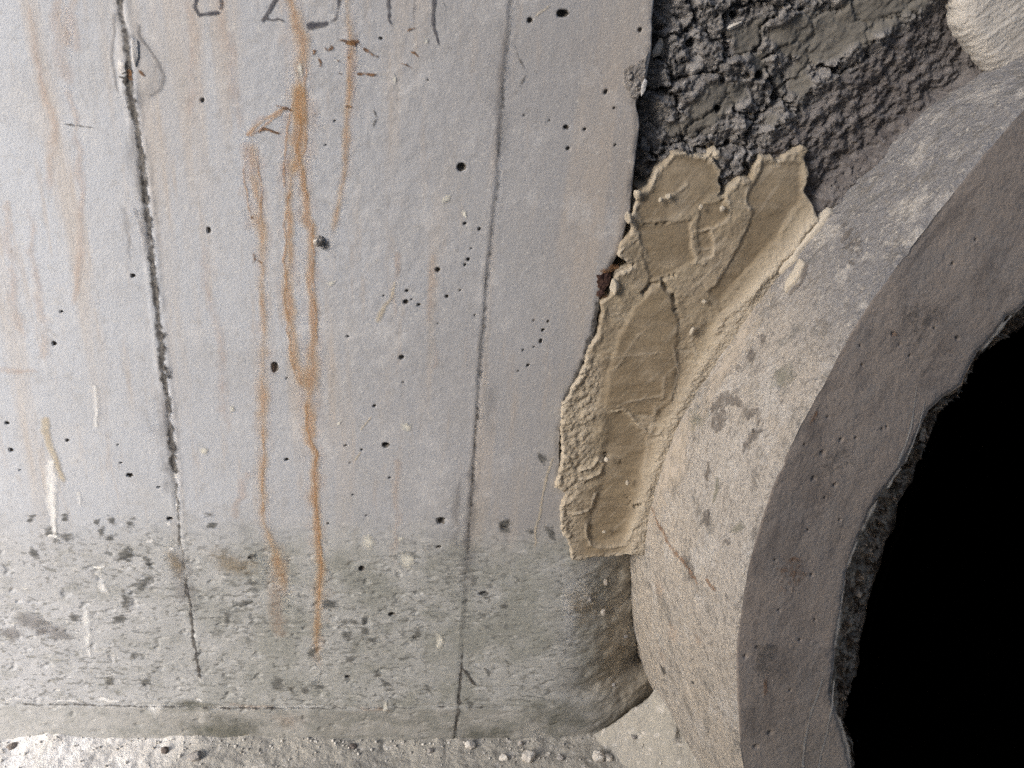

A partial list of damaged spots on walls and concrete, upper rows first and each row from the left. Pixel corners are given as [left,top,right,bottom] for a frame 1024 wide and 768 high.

spalling [633,0,983,294]
spalling [596,255,619,298]
crack [117,0,201,678]
damp [205,721,246,738]
crack [438,651,482,739]